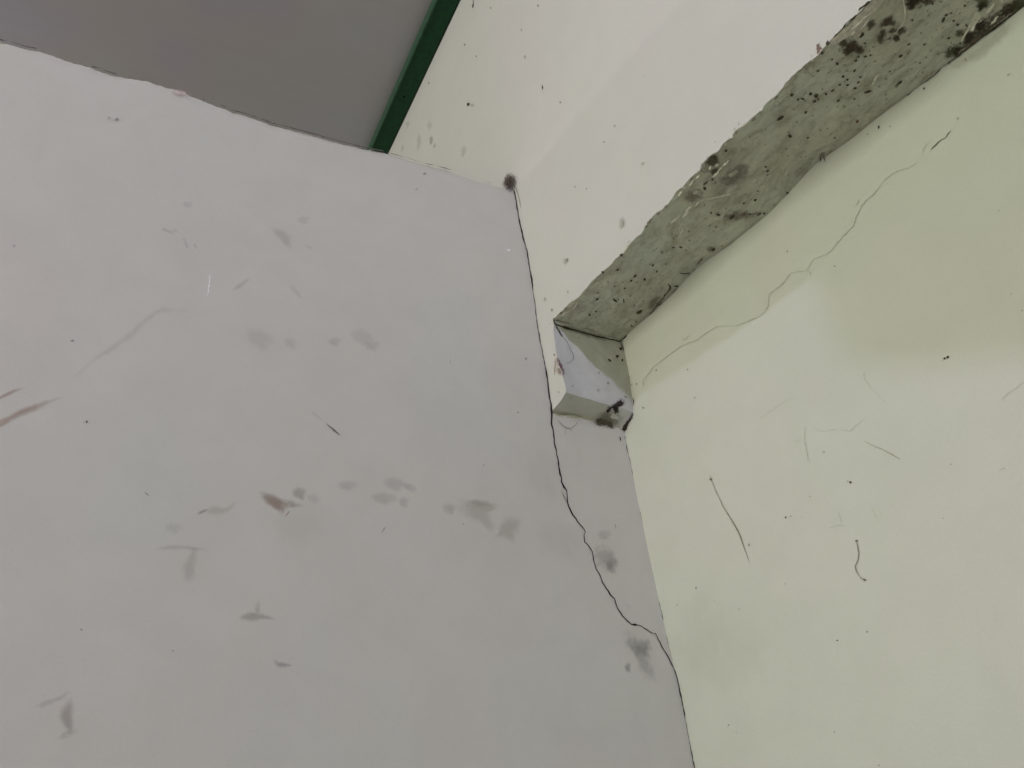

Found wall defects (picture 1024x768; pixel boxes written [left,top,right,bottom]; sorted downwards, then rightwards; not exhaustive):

mould [840,40,864,56]
mould [867,16,906,43]
mould [907,0,934,10]
damp [945,0,1024,64]
crack [644,134,948,379]
crack [387,152,695,768]